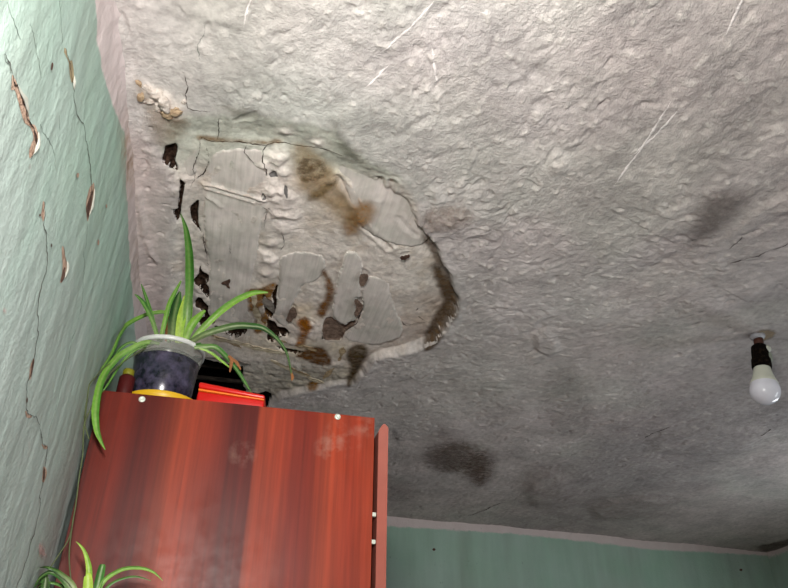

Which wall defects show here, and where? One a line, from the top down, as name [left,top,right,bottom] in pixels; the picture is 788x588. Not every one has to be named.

peeling [6,55,41,159]
peeling [27,201,52,383]
peeling [60,246,70,283]
peeling [64,48,76,91]
peeling [74,101,95,231]
spalling [135,80,465,408]
damp [299,154,348,217]
peeling [17,398,48,585]